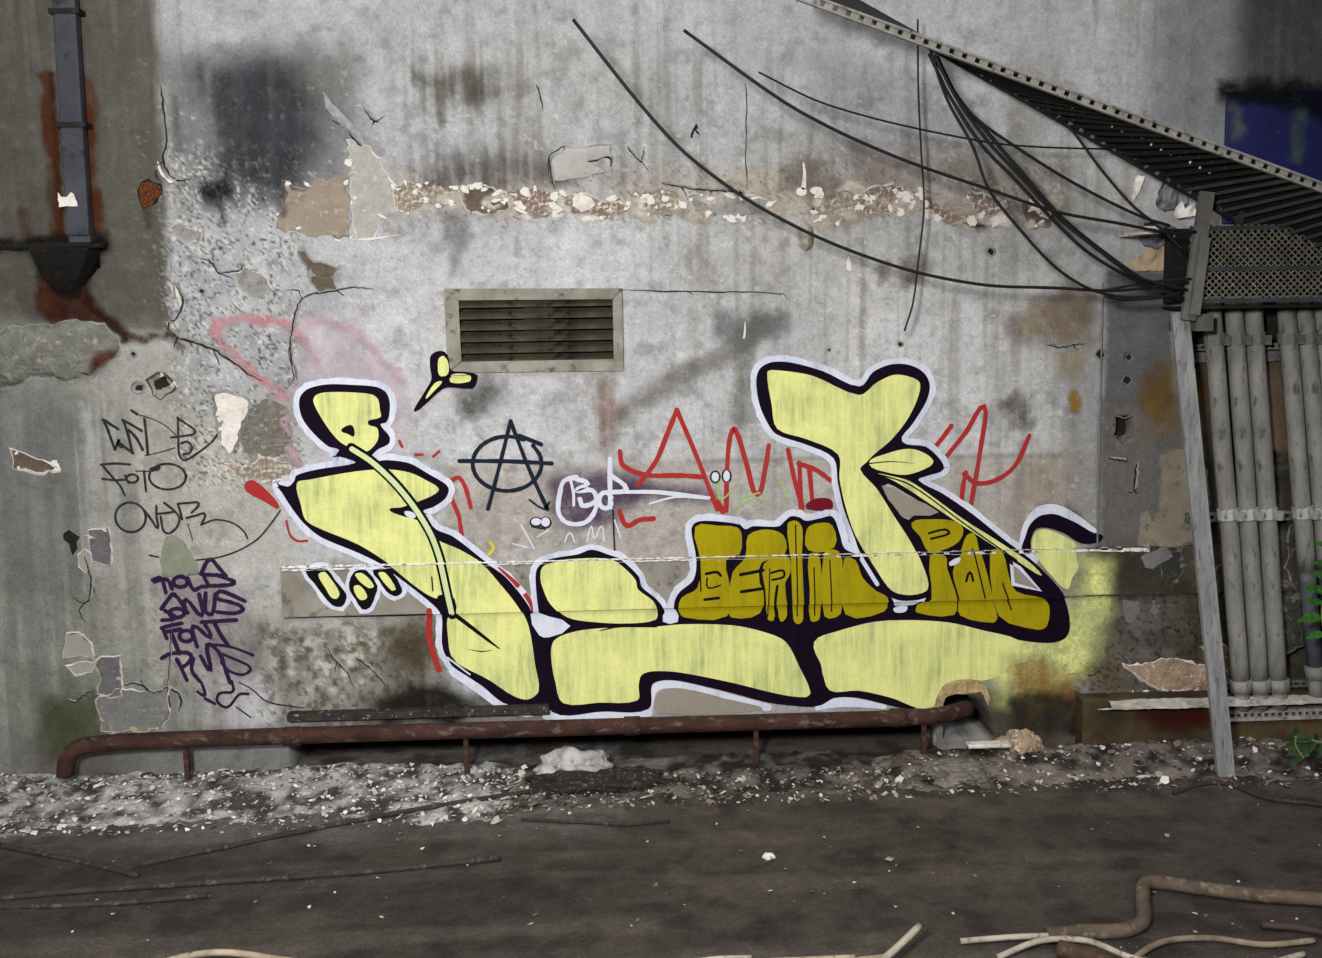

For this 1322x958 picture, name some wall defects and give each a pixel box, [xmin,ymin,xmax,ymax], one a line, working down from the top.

rust [39,74,64,236]
rust [84,79,102,233]
crack [155,84,191,183]
crack [332,107,384,146]
flaking render [276,139,778,295]
crack [200,258,244,279]
crack [167,282,374,390]
peeling [63,527,113,573]
peeling [62,632,172,734]
spalling [935,679,990,706]
flaking render [1098,646,1209,710]
flaking render [1215,564,1322,707]